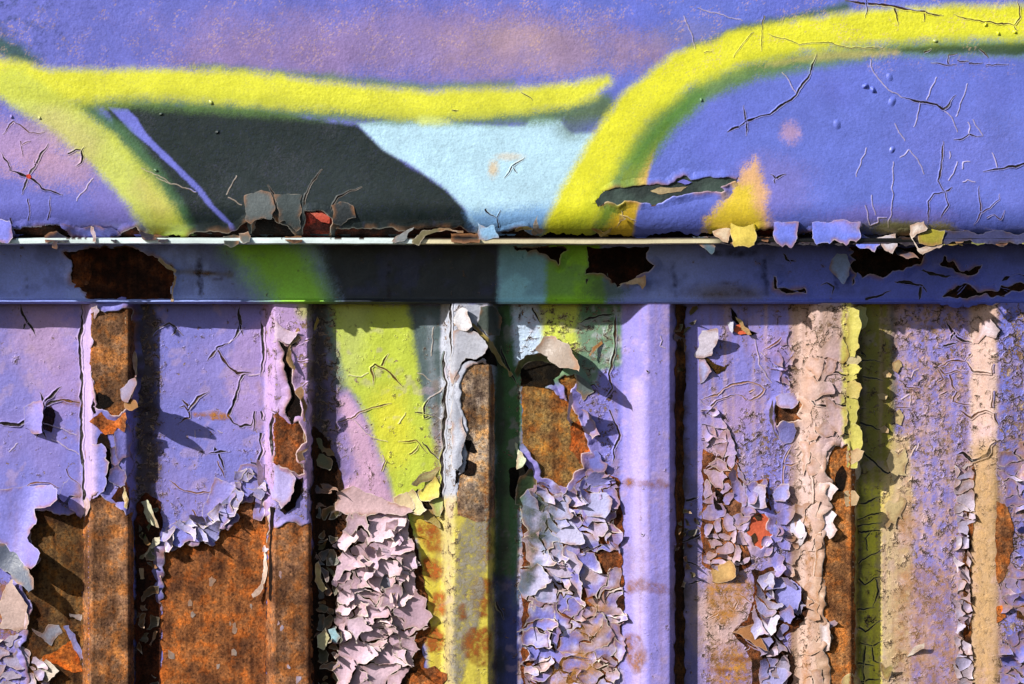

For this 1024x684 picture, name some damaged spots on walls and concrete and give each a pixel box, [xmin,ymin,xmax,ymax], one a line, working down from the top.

crack [0,120,94,225]
crack [151,321,184,336]
crack [169,305,277,516]
peeling [0,168,739,684]
corrosion [460,579,492,665]
peeling [674,304,868,684]
crack [683,0,1024,228]
peeling [692,219,1024,344]
peeling [953,463,977,684]
peeling [995,441,1024,684]